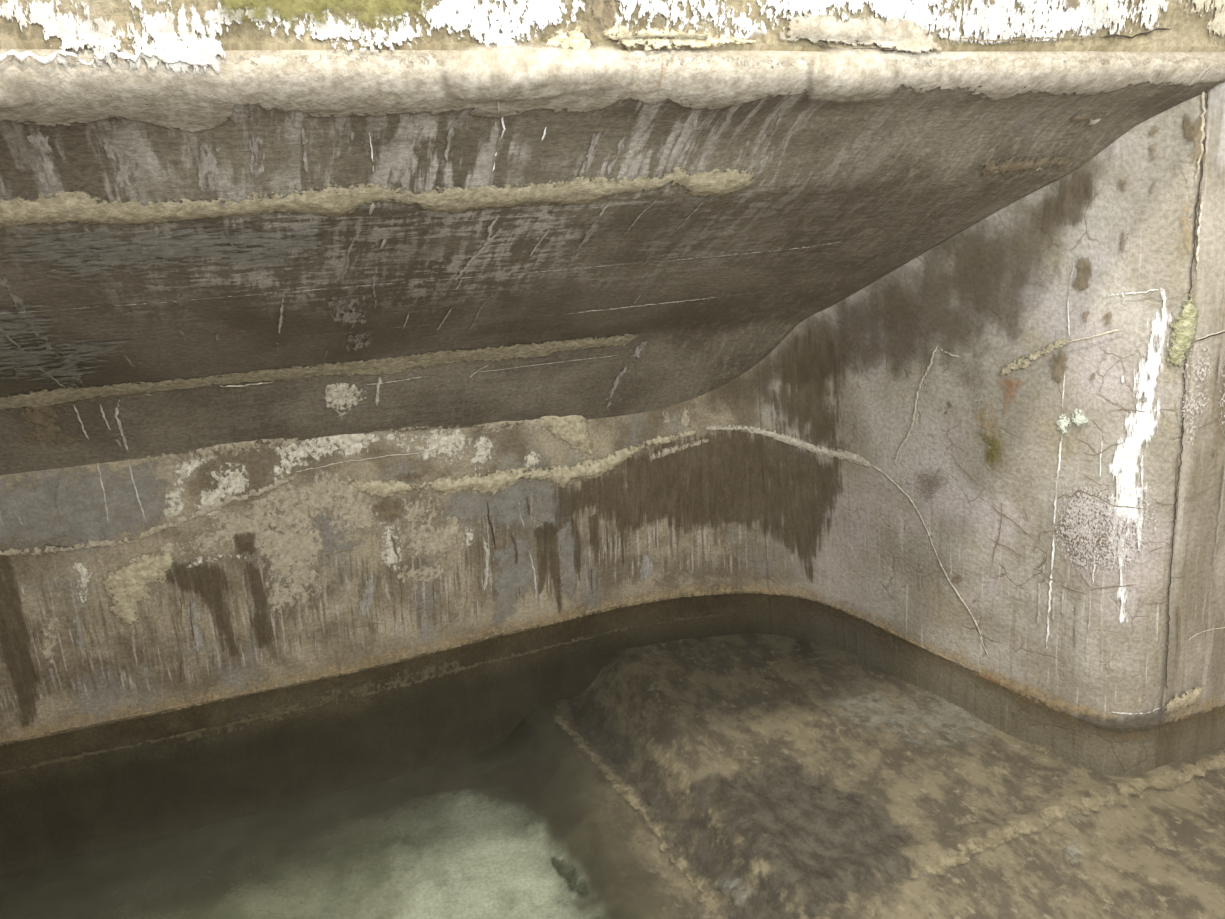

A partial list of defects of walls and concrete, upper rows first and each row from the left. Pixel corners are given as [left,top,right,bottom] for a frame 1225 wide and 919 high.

peeling [0,0,1225,133]
crack [1104,91,1208,300]
peeling [160,472,577,625]
leakage [0,155,1225,776]
crack [950,329,1225,687]